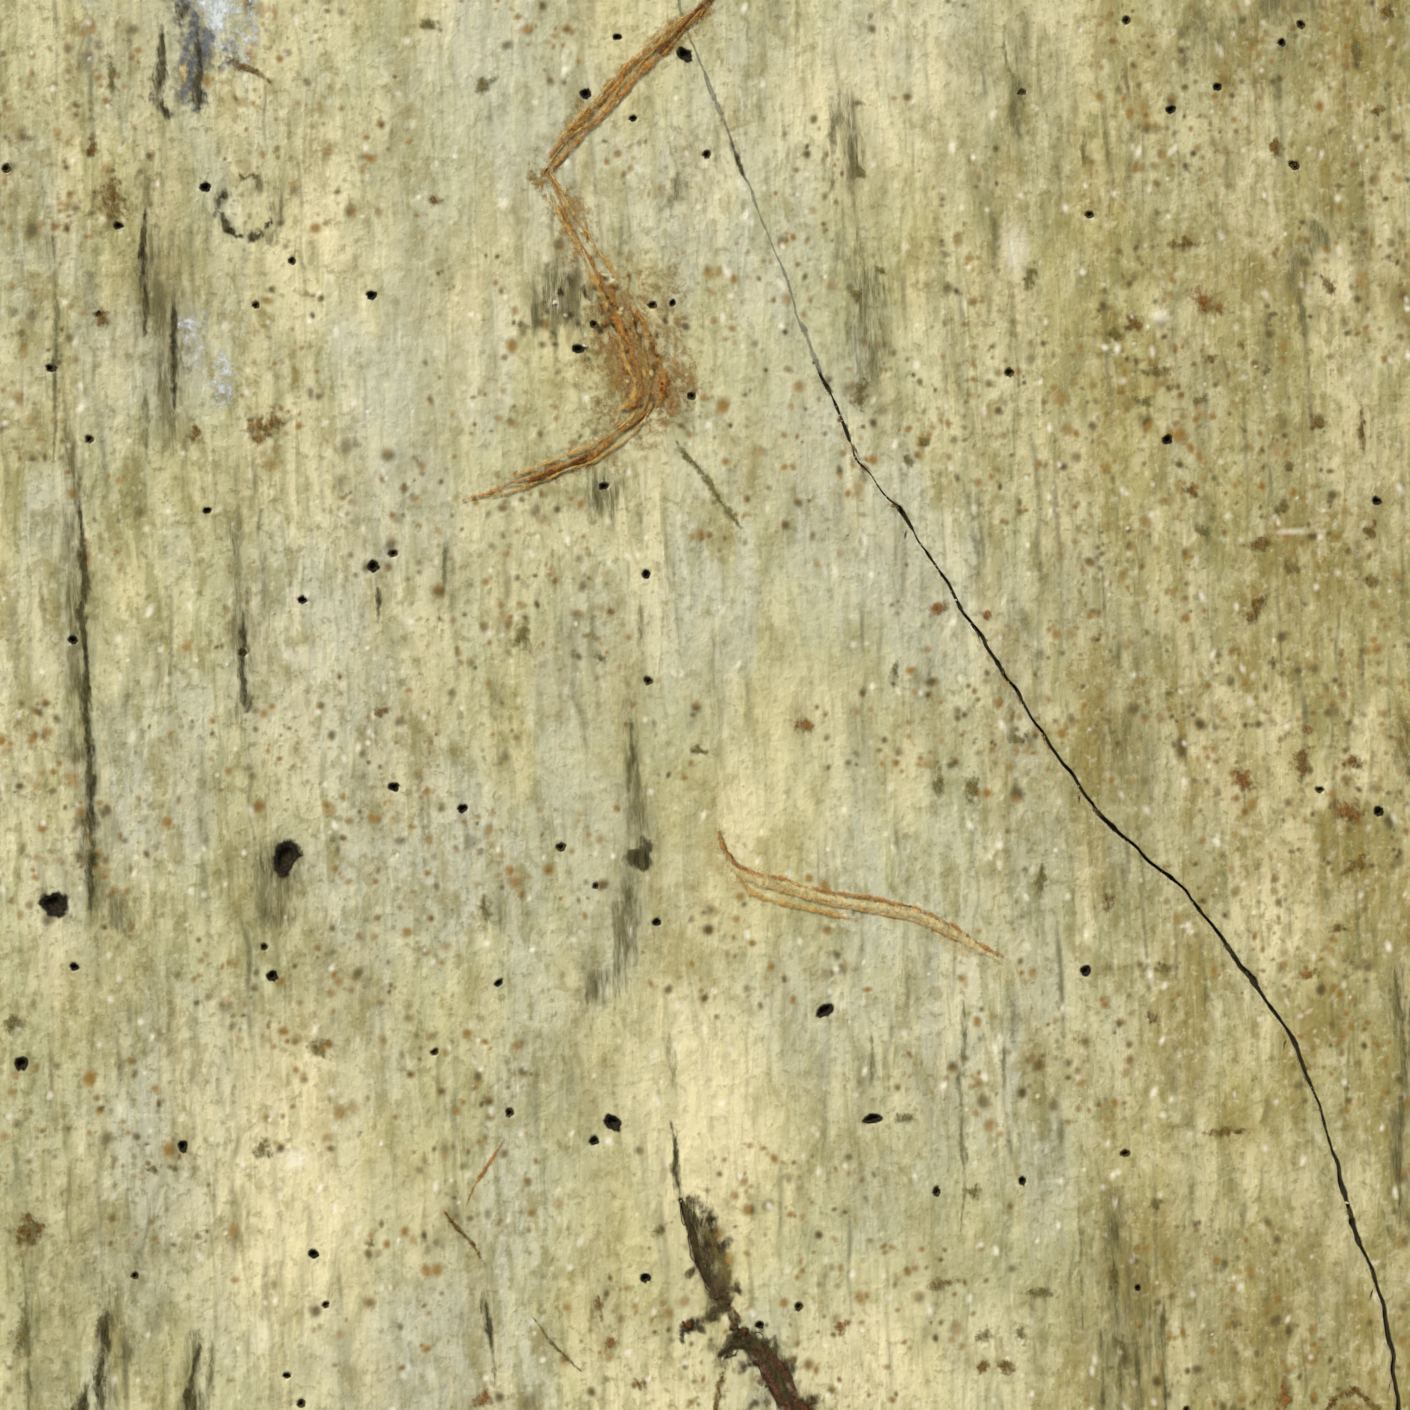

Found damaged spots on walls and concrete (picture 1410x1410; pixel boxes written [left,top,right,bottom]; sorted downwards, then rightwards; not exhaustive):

corrosion [462,0,713,501]
corrosion [709,831,1008,980]
crack [677,0,1405,1410]